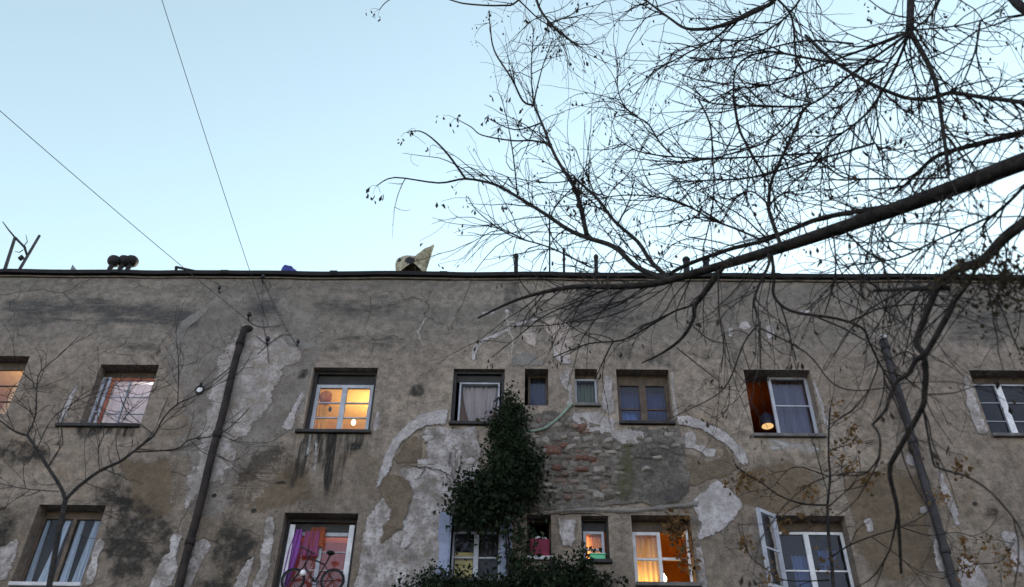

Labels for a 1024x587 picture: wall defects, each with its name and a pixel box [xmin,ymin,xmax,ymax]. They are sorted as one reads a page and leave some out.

peeling [0,539,19,580]
peeling [183,321,314,511]
damp [292,434,364,490]
peeling [353,409,482,587]
peeling [545,372,748,587]
peeling [963,374,989,435]